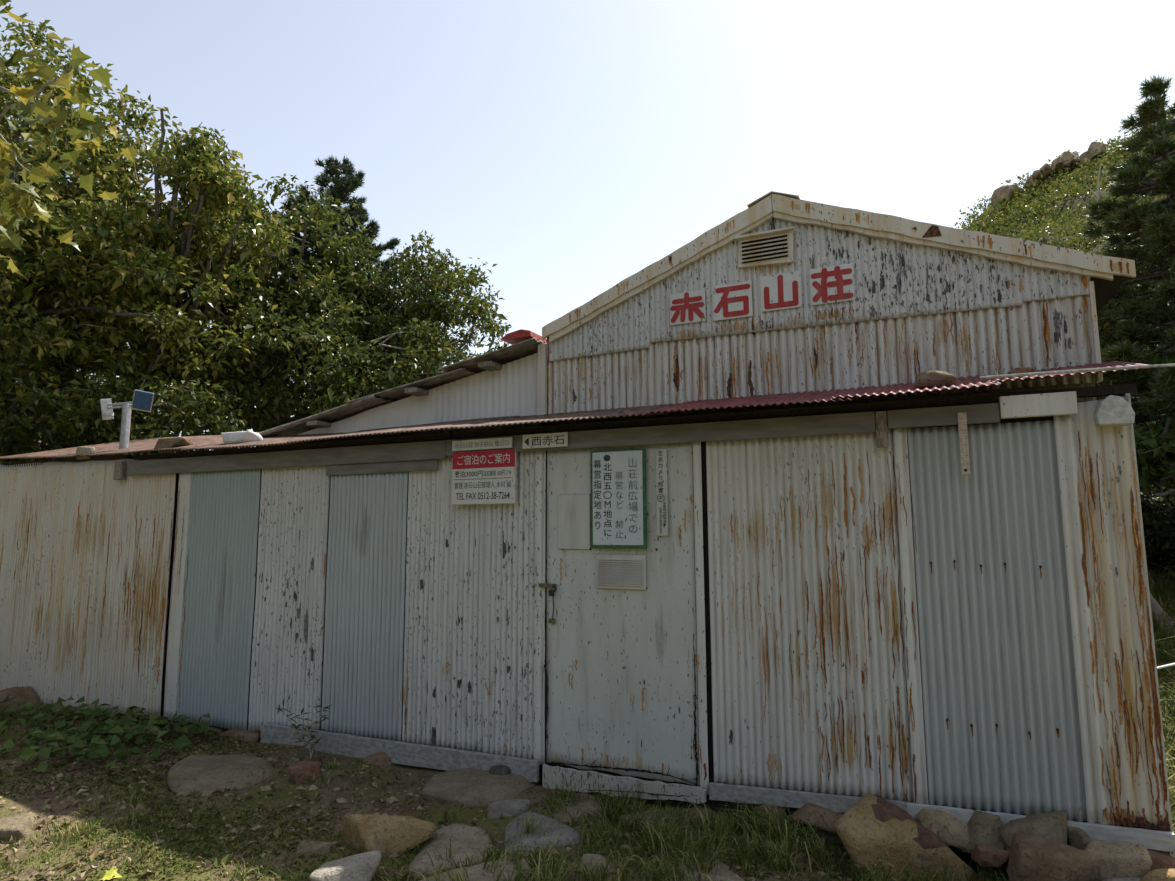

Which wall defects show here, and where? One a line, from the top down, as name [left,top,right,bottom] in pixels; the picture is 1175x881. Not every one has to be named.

peeling [799,227,1010,318]
corrosion [912,225,942,238]
corrosion [1110,260,1129,274]
corrosion [547,336,648,405]
corrosion [657,305,920,403]
corrosion [927,311,979,372]
corrosion [0,483,189,704]
corrosion [722,454,917,804]
corrosion [1078,430,1169,827]